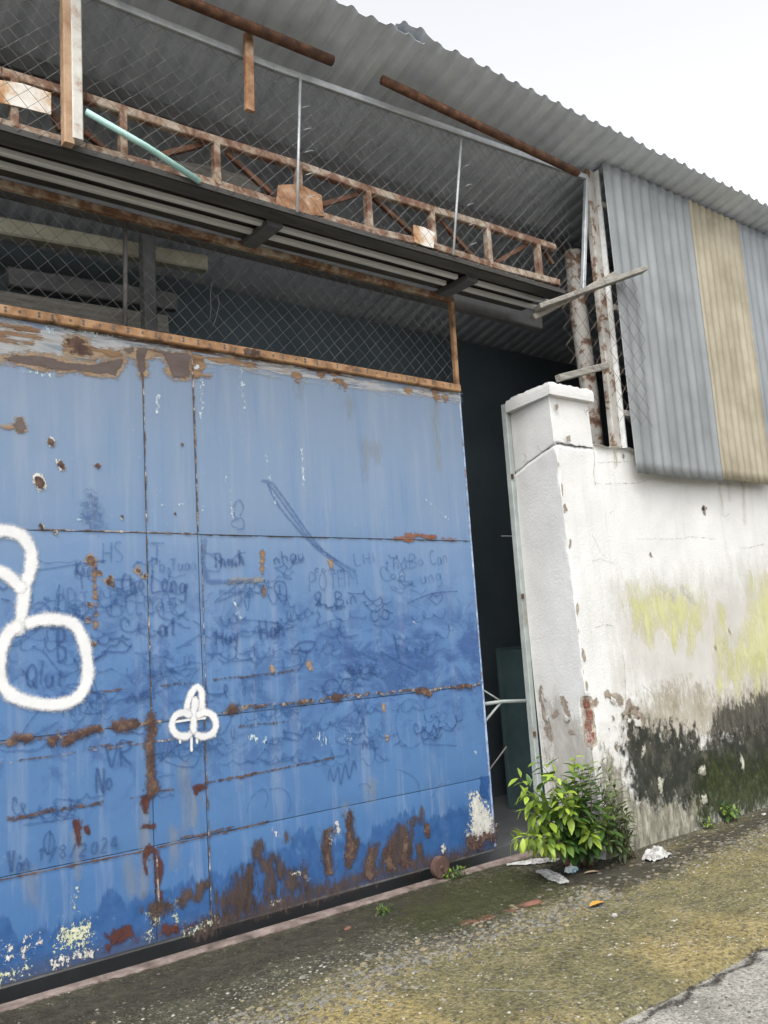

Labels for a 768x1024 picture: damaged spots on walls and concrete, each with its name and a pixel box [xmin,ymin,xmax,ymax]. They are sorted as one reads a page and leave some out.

peeling [0,316,461,422]
crack [518,442,620,486]
rust [0,322,483,942]
spalling [539,648,646,752]
water stain [544,608,768,860]
peeling [463,776,499,858]
peeling [0,886,95,984]